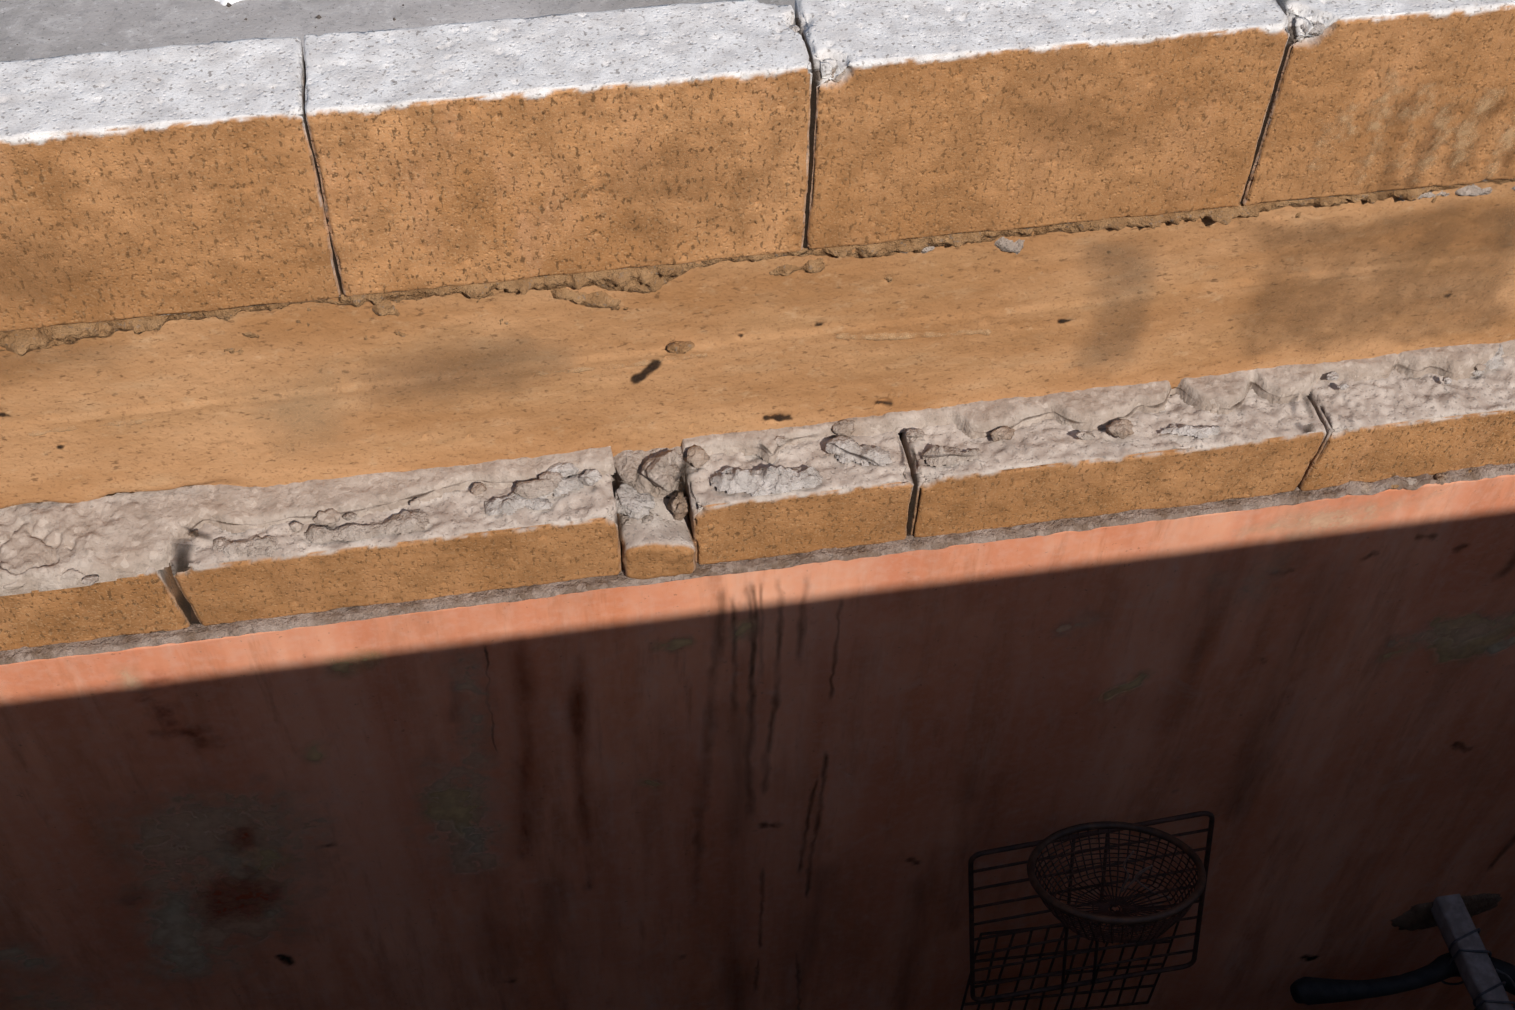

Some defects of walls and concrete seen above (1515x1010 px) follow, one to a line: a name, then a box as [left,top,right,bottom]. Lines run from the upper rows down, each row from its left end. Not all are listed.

crack [301,114,344,295]
crack [796,18,819,248]
crack [1240,0,1297,204]
crack [175,520,239,624]
crack [406,490,434,499]
crack [762,412,1078,536]